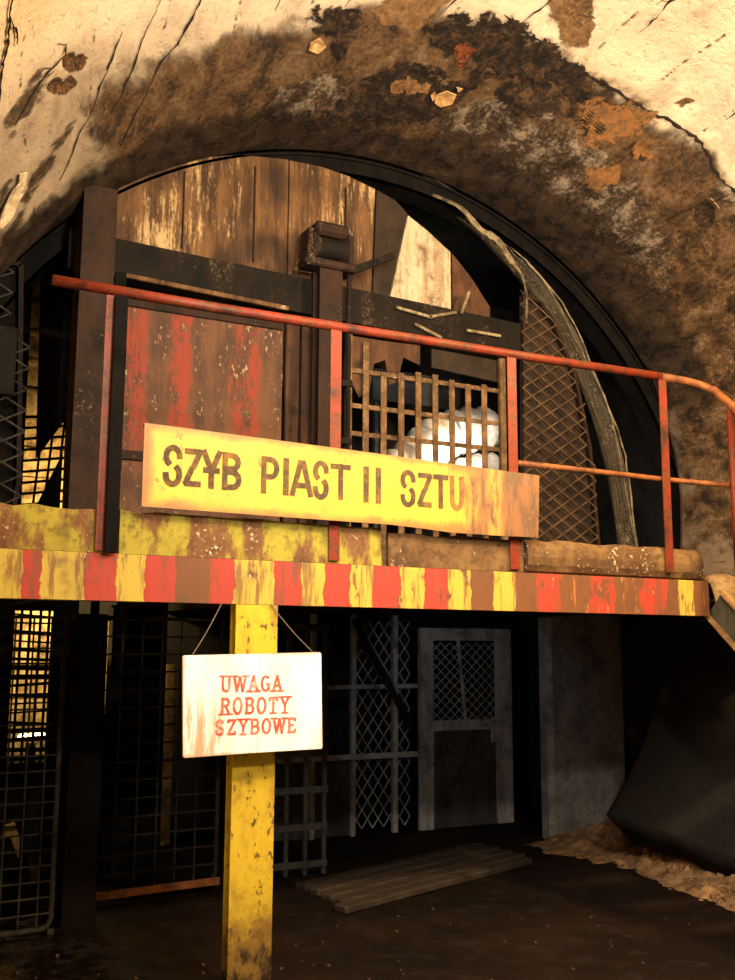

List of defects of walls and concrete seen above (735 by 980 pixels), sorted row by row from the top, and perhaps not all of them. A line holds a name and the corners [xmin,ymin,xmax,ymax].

crack [0,0,18,99]
crack [15,43,67,126]
spalling [47,52,88,95]
spalling [564,0,592,29]
crack [504,0,735,225]
water stain [83,0,735,553]